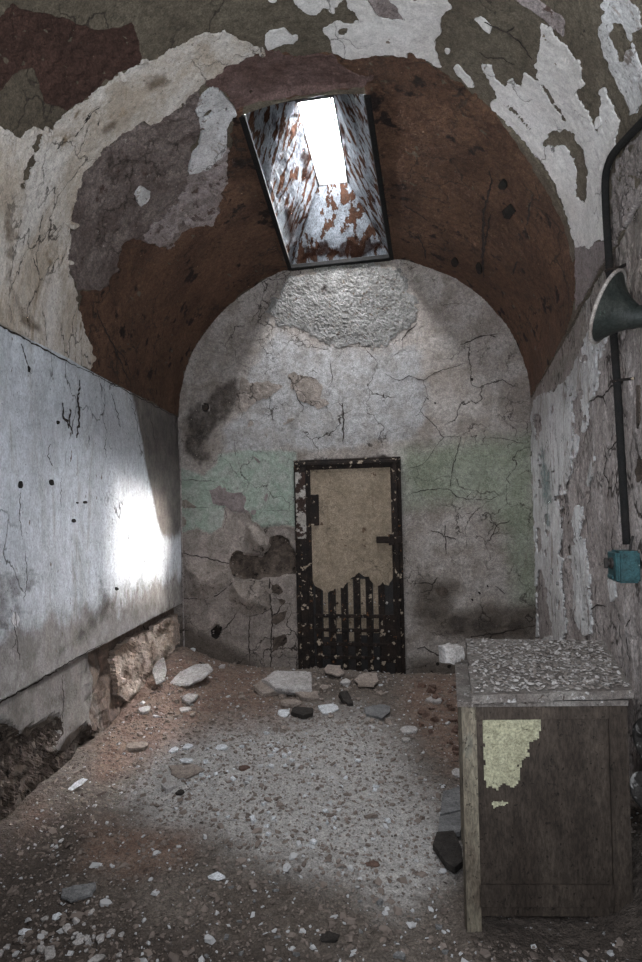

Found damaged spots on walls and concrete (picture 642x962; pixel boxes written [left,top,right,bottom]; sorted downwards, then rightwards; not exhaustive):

corrosion [297,133,312,179]
corrosion [285,209,295,241]
corrosion [302,236,381,260]
crack [0,309,175,456]
leakage [186,380,238,461]
flaking render [0,0,642,702]
crack [330,364,345,441]
crack [571,385,613,407]
crack [183,553,229,600]
crack [561,442,616,635]
crack [223,578,282,667]
flaking render [0,716,100,821]